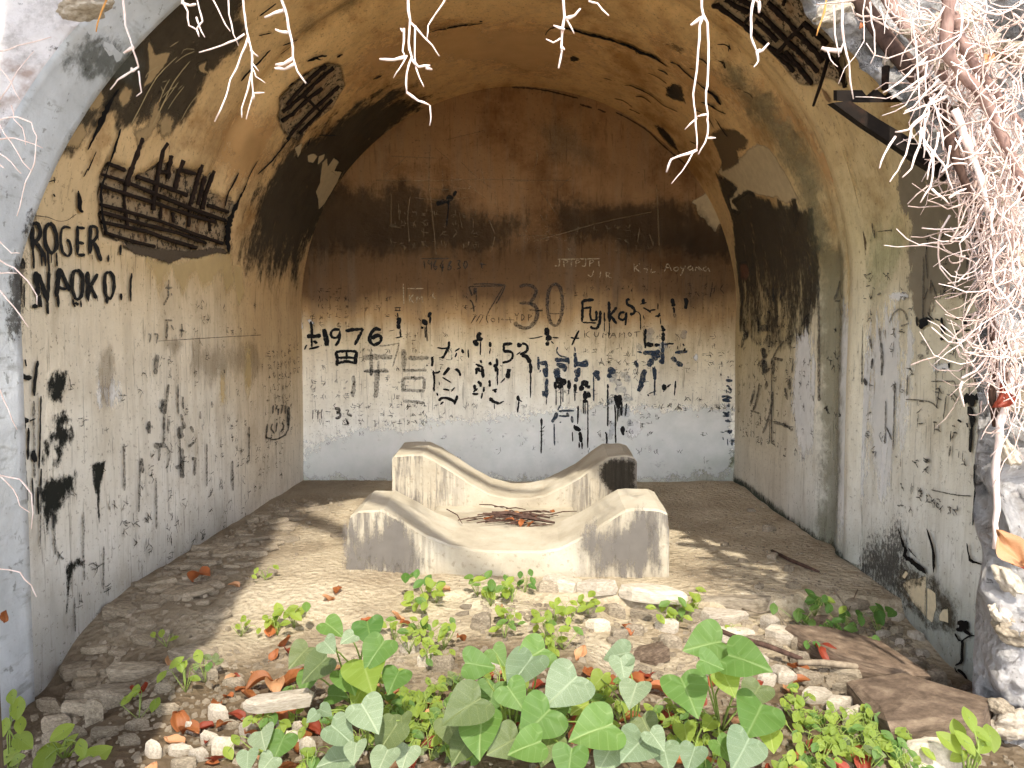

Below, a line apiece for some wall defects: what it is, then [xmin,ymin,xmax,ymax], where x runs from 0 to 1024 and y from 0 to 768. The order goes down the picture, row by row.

spalling [711,0,847,107]
spalling [97,100,234,265]
spalling [279,63,345,209]
peeling [711,128,798,211]
damp [792,199,814,240]
crack [898,529,935,615]
spalling [902,572,948,623]
crack [966,543,982,565]
crack [955,620,974,679]